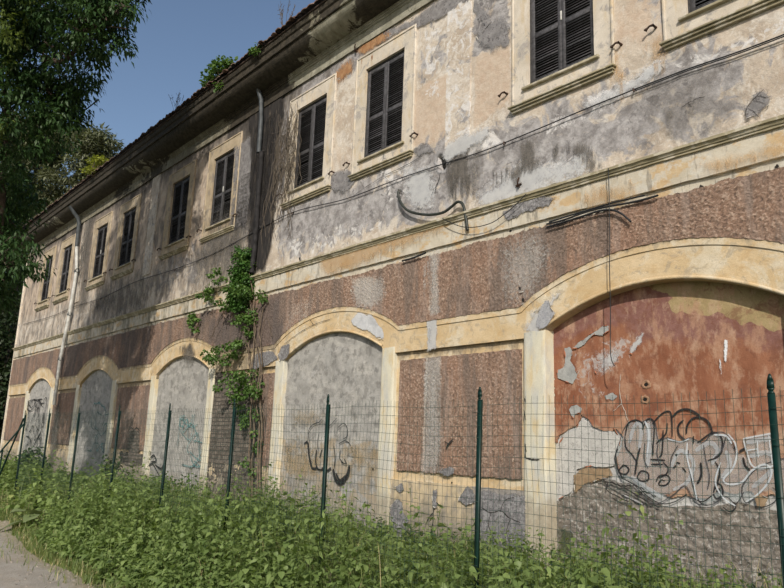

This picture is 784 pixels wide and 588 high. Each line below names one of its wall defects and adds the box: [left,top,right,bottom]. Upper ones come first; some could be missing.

spalling [381,0,510,50]
spalling [745,91,771,119]
damp [404,166,435,211]
damp [443,127,595,204]
peeling [351,313,384,339]
spalling [524,294,559,332]
peeling [557,325,610,384]
peeling [559,405,621,499]